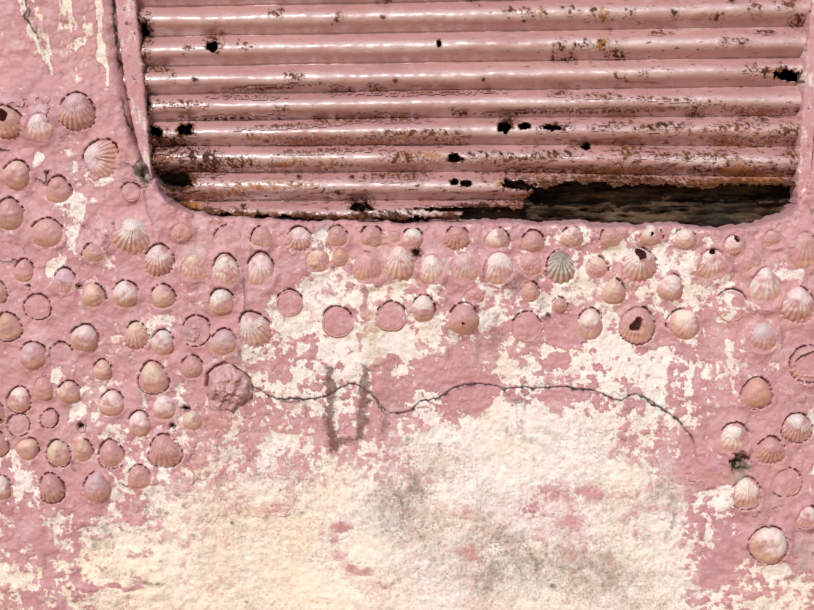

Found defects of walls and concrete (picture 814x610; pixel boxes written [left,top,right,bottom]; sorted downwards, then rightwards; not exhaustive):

crack [20,0,64,76]
peeling [16,0,128,156]
corrosion [746,0,808,30]
crack [231,246,253,332]
peeling [0,122,814,610]
crack [245,362,700,457]